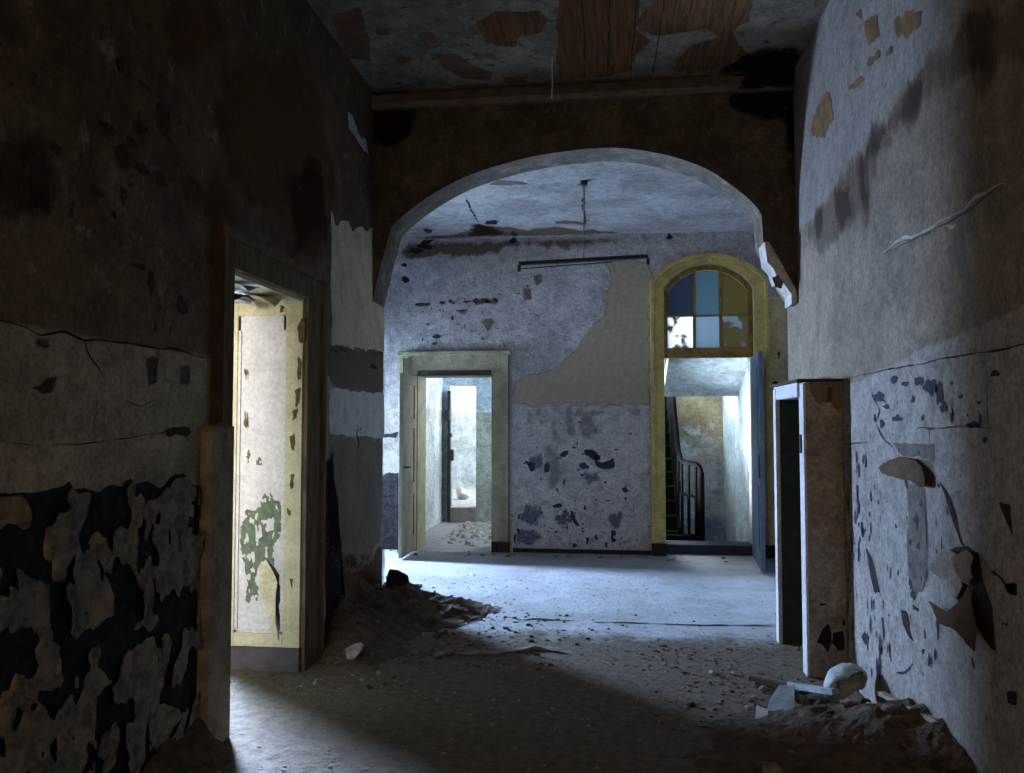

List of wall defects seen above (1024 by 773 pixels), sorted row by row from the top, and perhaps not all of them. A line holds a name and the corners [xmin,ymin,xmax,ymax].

peeling [856,9,922,66]
leakage [808,3,1024,252]
crack [0,320,212,445]
peeling [289,357,302,450]
peeling [330,210,385,352]
flaking render [415,289,520,347]
leakage [401,220,618,283]
flaking render [513,260,653,548]
crack [843,343,1024,454]
peeling [0,473,206,773]
peeling [240,493,291,640]
peeling [817,376,1008,678]